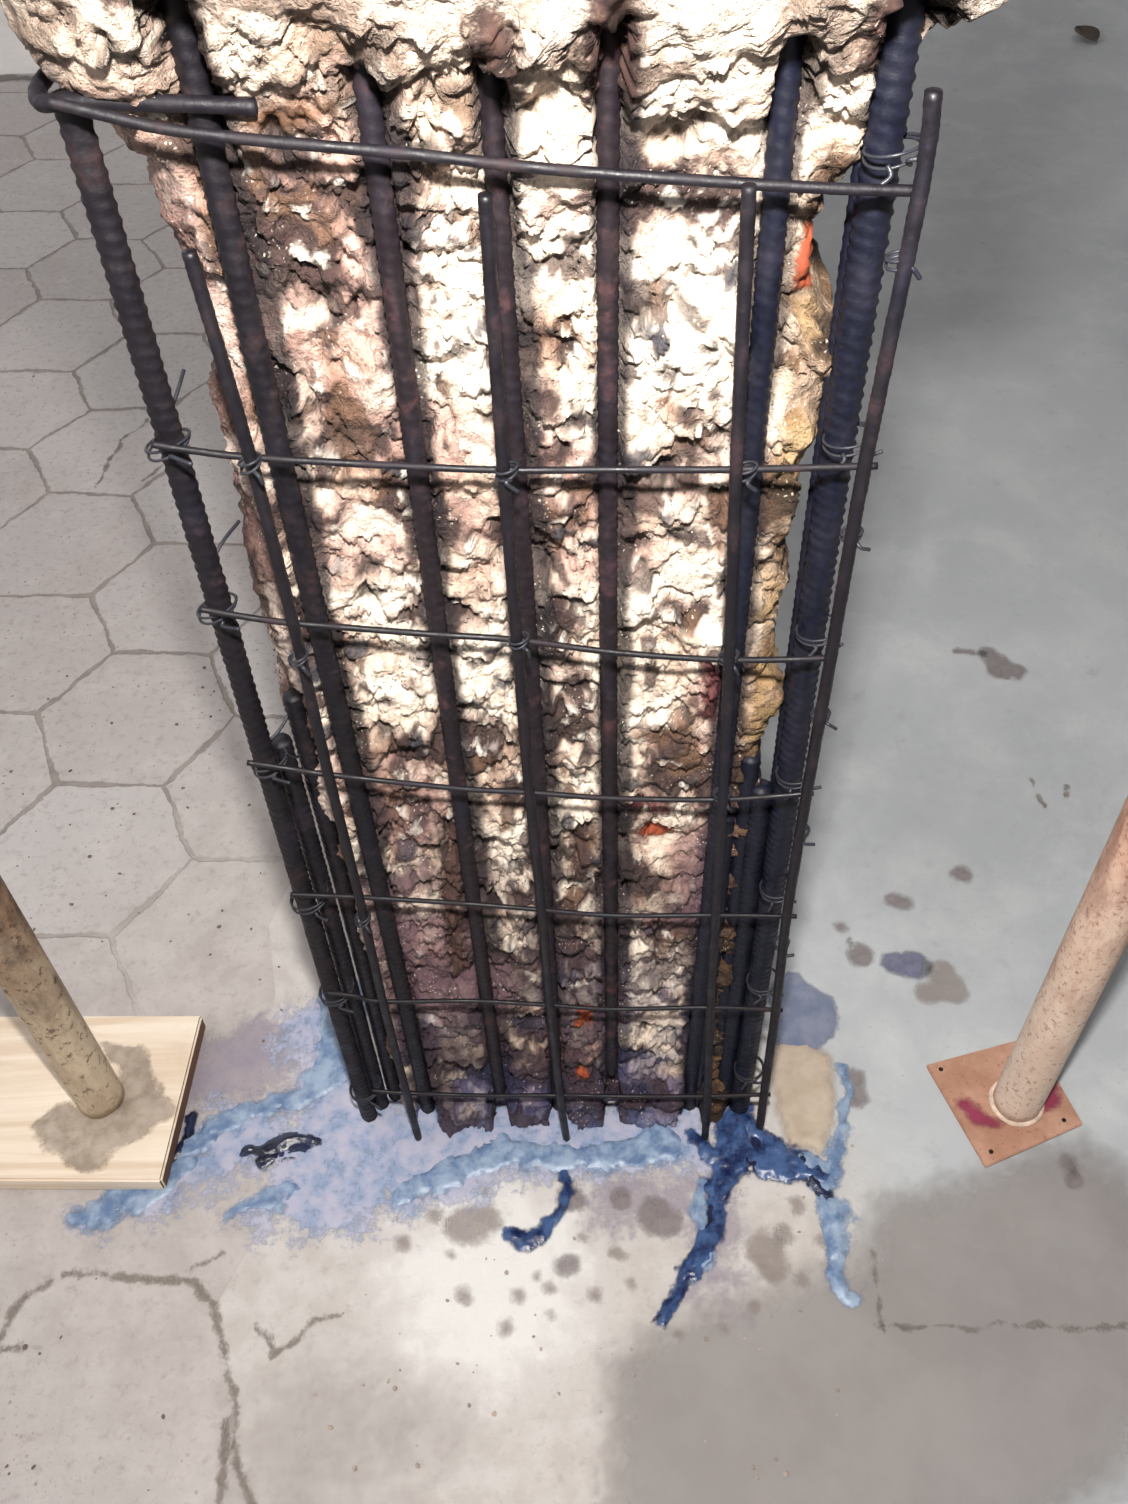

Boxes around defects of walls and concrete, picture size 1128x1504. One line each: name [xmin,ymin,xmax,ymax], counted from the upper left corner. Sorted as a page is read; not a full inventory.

spalling [0,0,1009,1138]
leakage [954,648,1025,679]
leakage [952,867,971,881]
leakage [886,895,910,908]
leakage [837,924,966,1002]
leakage [567,1188,585,1210]
leakage [430,1208,498,1241]
leakage [536,1256,578,1291]
crack [871,1251,976,1332]
leakage [611,1153,1128,1504]
crack [1026,1321,1126,1332]
crack [0,1252,341,1504]